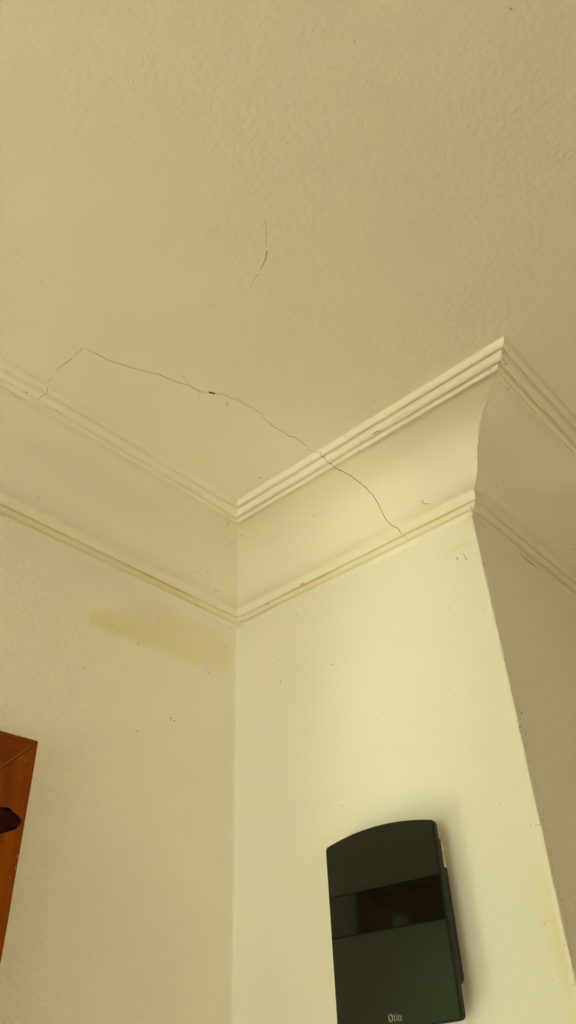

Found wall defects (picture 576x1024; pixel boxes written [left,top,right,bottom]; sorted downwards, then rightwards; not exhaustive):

crack [37,348,412,542]